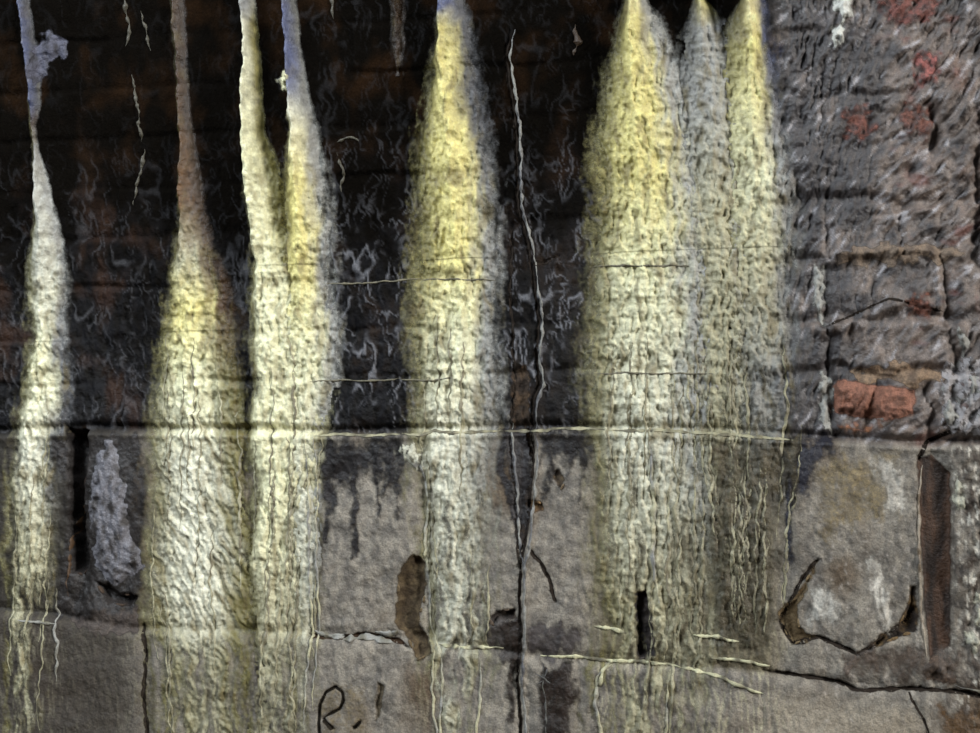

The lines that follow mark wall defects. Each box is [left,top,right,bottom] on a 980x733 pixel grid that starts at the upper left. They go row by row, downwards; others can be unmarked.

damp [0,0,581,733]
crack [503,31,558,733]
damp [539,0,908,733]
spalling [66,428,90,448]
spalling [394,554,432,661]
spalling [778,567,815,644]
crack [779,560,914,656]
spalling [873,586,919,646]
crack [772,671,980,733]